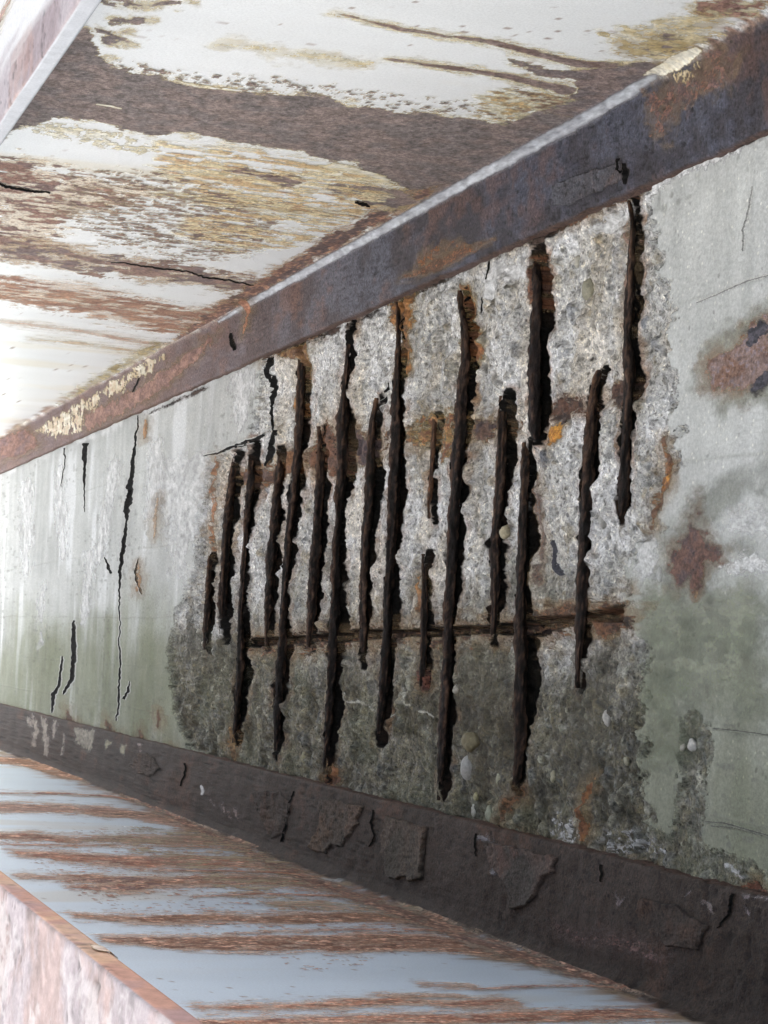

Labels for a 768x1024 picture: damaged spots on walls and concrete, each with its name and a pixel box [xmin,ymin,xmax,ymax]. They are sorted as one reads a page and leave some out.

peeling [11,0,660,210]
corrosion [106,53,577,122]
corrosion [339,0,768,69]
corrosion [0,140,433,432]
crack [60,443,91,512]
crack [103,415,144,721]
leakage [143,438,210,578]
spalling [164,190,768,891]
leakage [629,536,657,578]
crack [50,620,78,713]
leakage [27,713,142,755]
corrosion [0,792,668,1024]